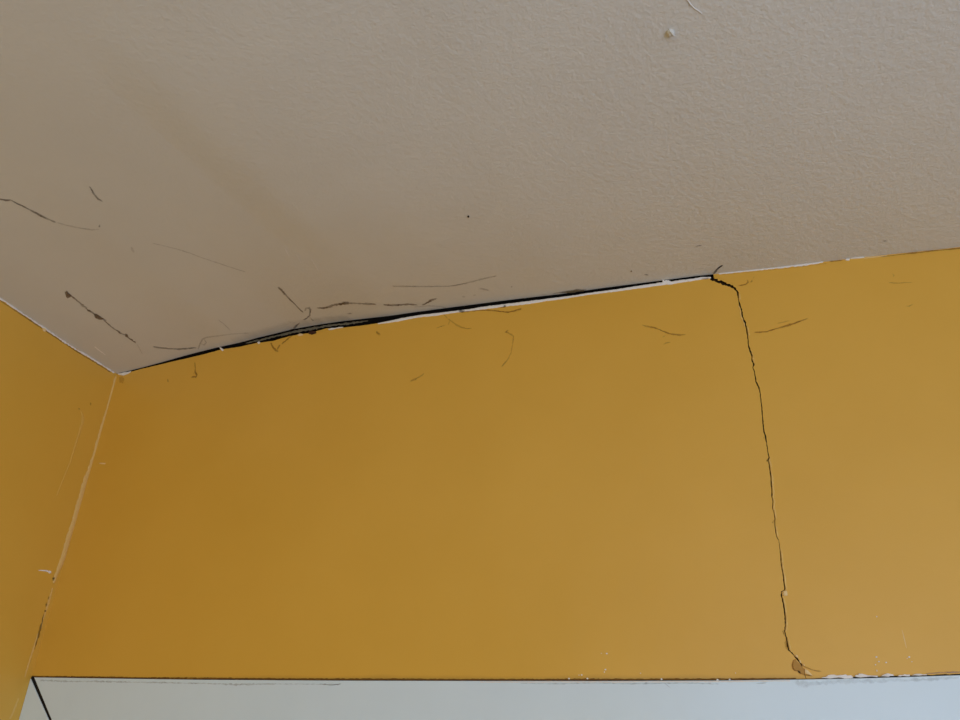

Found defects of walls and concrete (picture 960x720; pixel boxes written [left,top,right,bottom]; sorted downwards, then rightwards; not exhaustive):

crack [65,291,135,342]
crack [271,288,433,349]
crack [481,265,805,683]